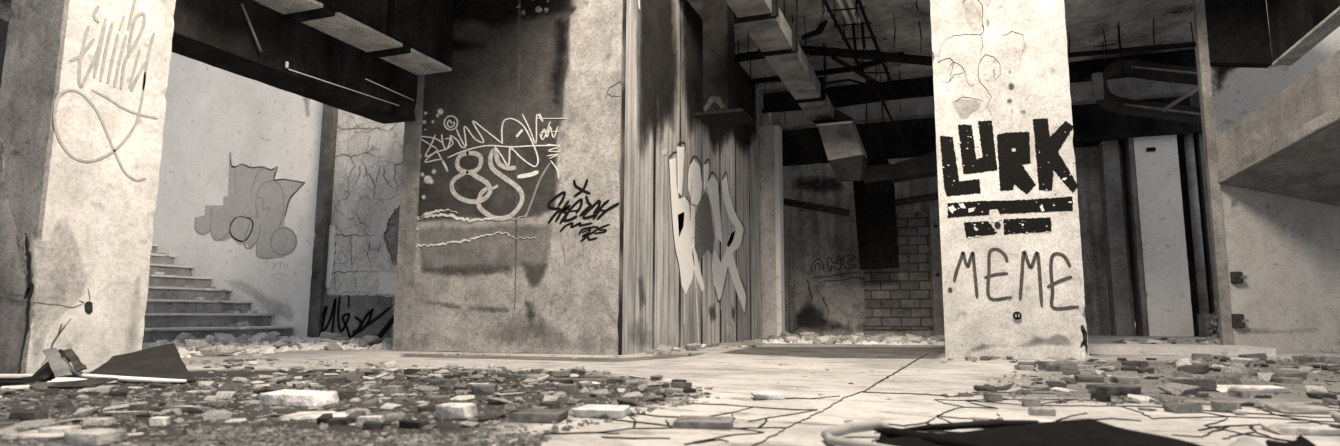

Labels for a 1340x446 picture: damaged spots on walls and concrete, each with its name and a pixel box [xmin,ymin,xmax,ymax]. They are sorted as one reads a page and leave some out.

crack [938,0,1025,116]
crack [332,123,402,291]
spalling [383,205,400,265]
peeling [416,209,535,248]
crack [0,233,90,373]
crack [543,353,1340,446]